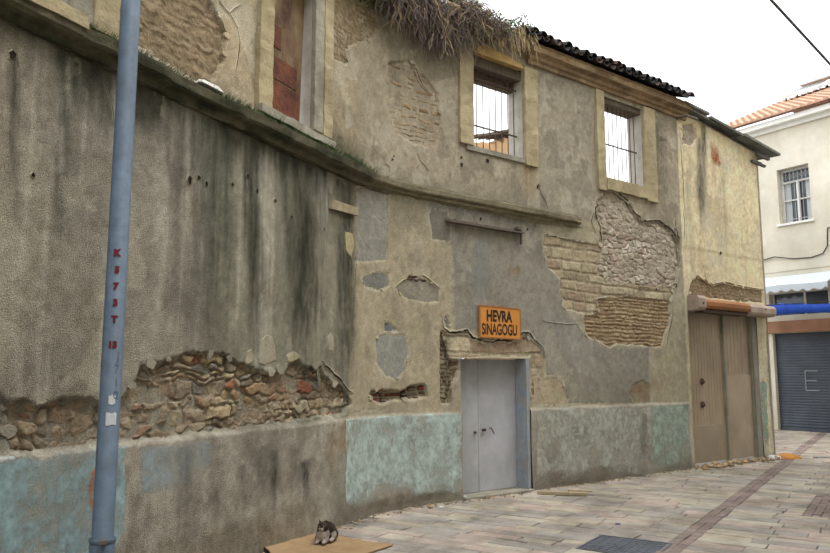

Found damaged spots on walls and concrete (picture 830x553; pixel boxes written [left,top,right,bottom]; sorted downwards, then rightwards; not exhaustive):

spalling [139,0,231,82]
leakage [249,149,257,290]
leakage [295,167,311,316]
peeling [344,188,387,262]
peeling [363,271,439,303]
spalling [543,191,681,347]
spalling [688,276,762,303]
peeling [376,319,408,380]
spalling [439,315,544,403]
crack [440,314,578,357]
peeling [0,399,99,553]
spalling [114,335,462,547]